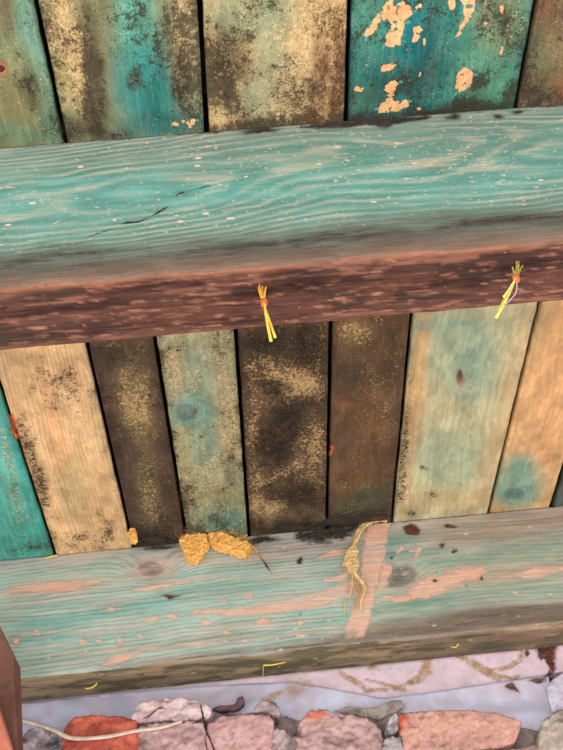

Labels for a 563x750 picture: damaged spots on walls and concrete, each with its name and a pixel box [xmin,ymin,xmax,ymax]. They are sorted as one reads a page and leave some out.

peeling [363,0,426,50]
peeling [448,0,481,40]
leakage [82,7,106,136]
leakage [277,19,342,123]
peeling [374,80,421,113]
peeling [454,67,478,96]
crack [89,185,211,237]
peeling [7,580,101,593]
peeling [194,523,486,638]
peeling [499,567,563,578]
peeling [104,655,135,665]
crack [193,705,215,750]